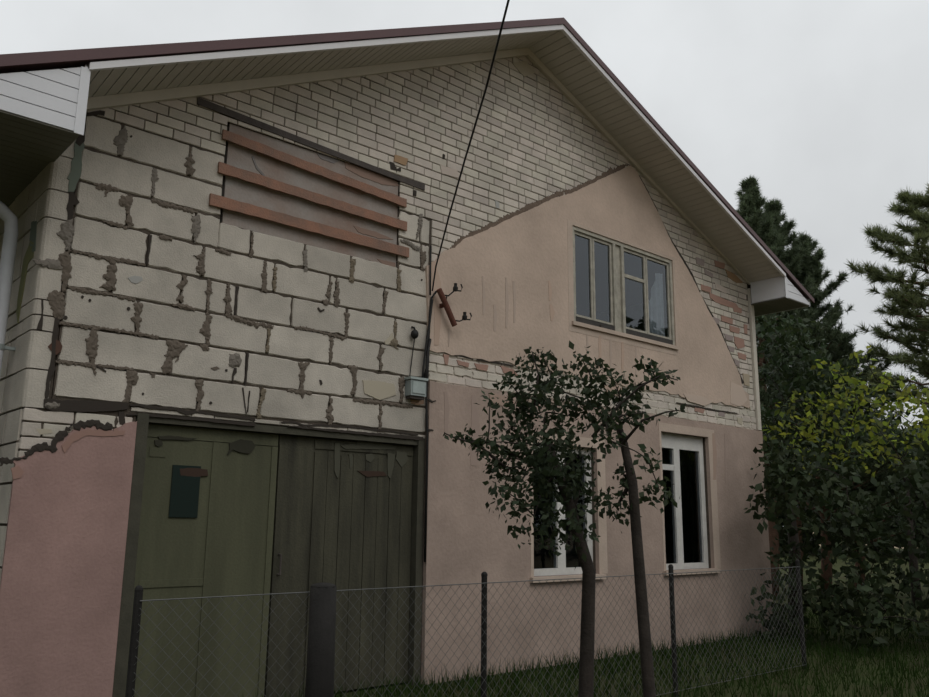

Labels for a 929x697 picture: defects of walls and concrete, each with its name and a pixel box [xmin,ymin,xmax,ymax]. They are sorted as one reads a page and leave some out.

peeling [696,257,748,367]
spalling [0,419,114,466]